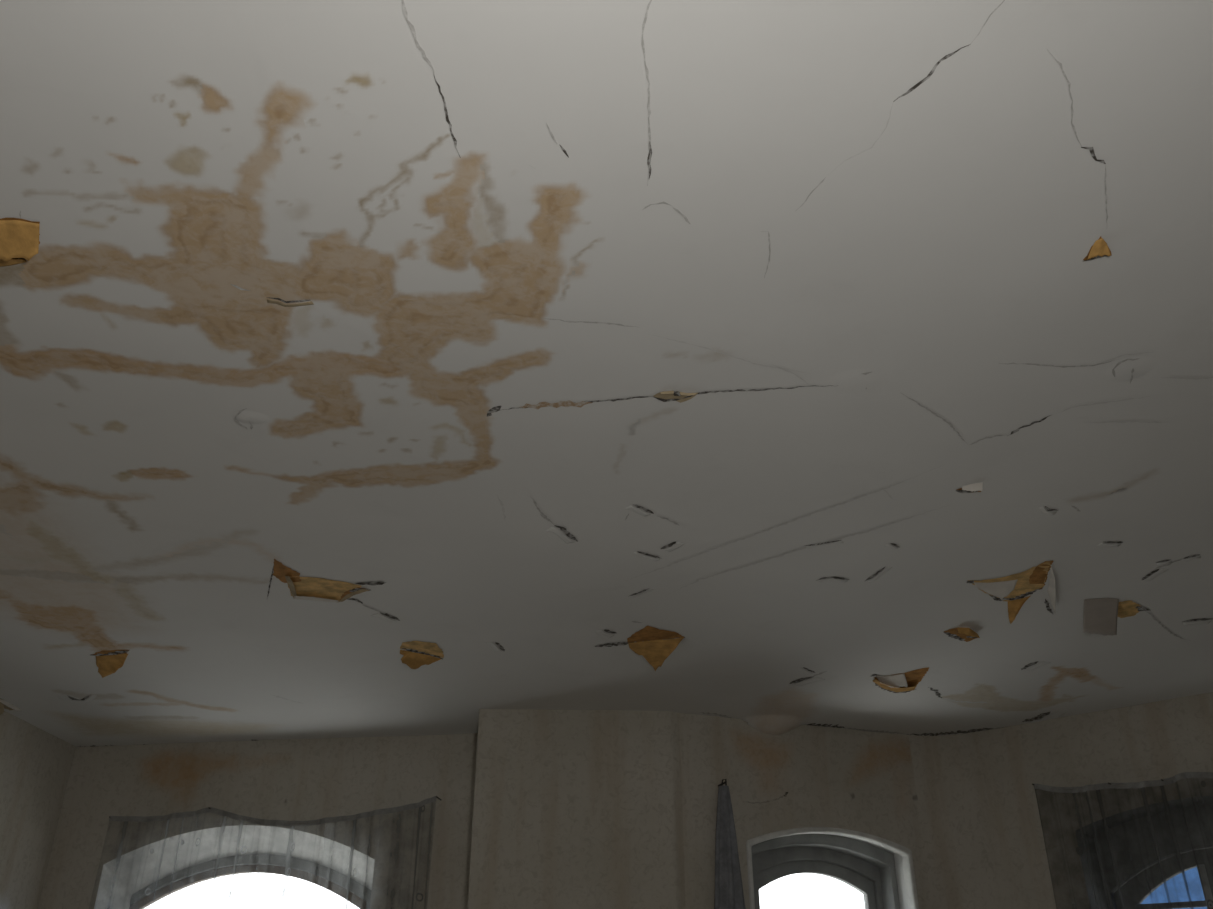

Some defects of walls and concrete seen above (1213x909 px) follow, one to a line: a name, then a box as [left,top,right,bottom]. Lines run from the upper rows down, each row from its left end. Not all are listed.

crack [402,0,461,158]
crack [546,123,569,158]
crack [642,0,690,224]
crack [797,0,1005,210]
crack [1047,49,1108,223]
damp [0,70,607,507]
crack [486,396,654,417]
crack [544,318,871,394]
crack [900,392,1144,445]
damp [935,665,1126,713]